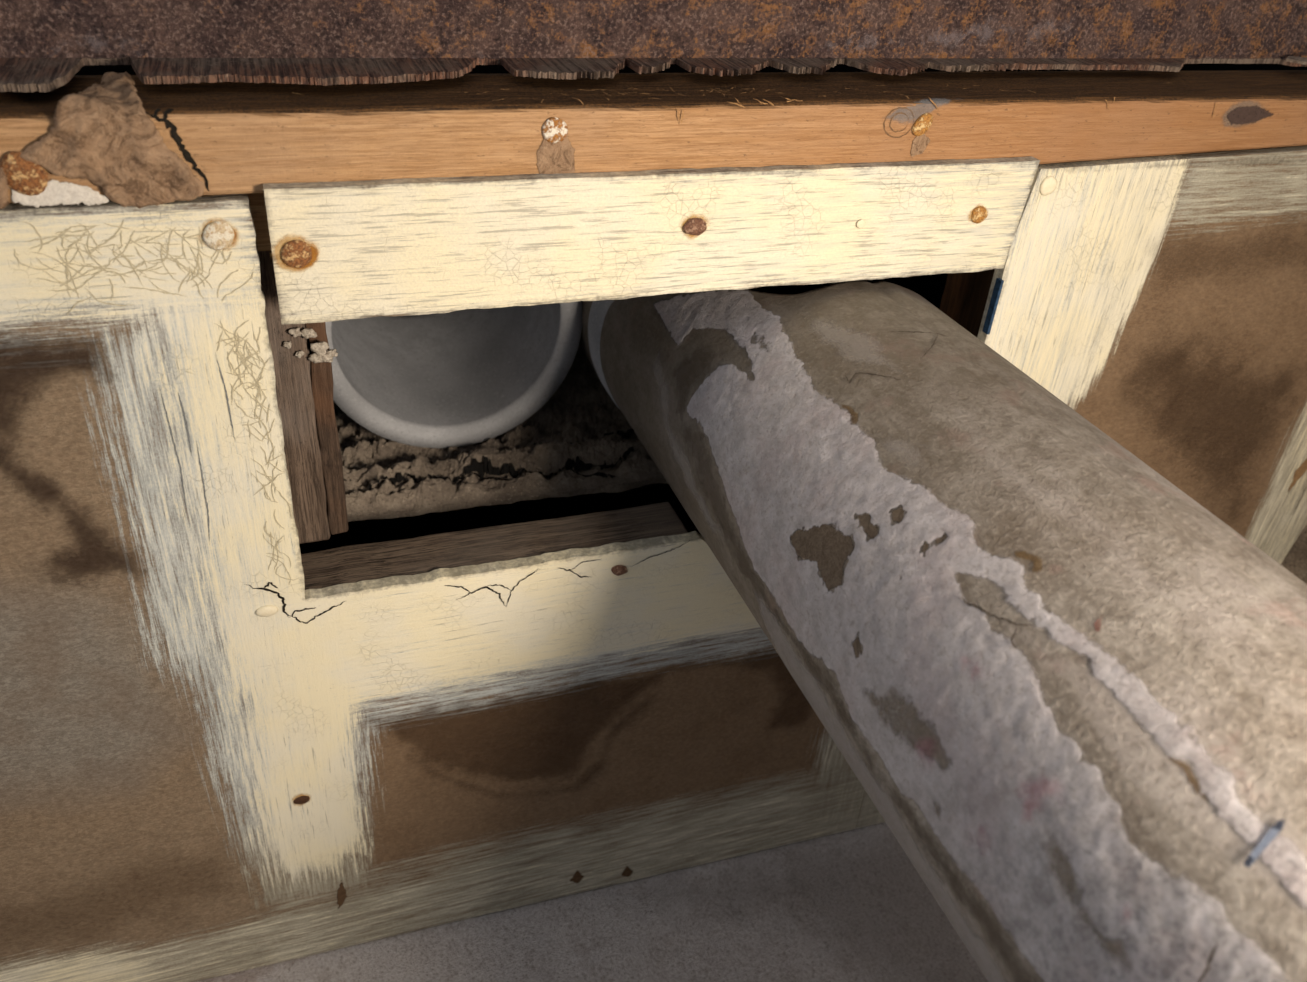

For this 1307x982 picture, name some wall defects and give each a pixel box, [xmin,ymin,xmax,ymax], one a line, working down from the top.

crack [145,108,209,191]
peeling [11,180,109,208]
corrosion [275,237,318,271]
crack [14,220,345,624]
crack [368,428,642,490]
peeling [1288,459,1307,491]
spalling [892,508,905,523]
spalling [790,512,878,590]
spalling [922,532,948,555]
crack [445,559,601,606]
spalling [852,638,862,658]
water stain [654,290,1307,982]